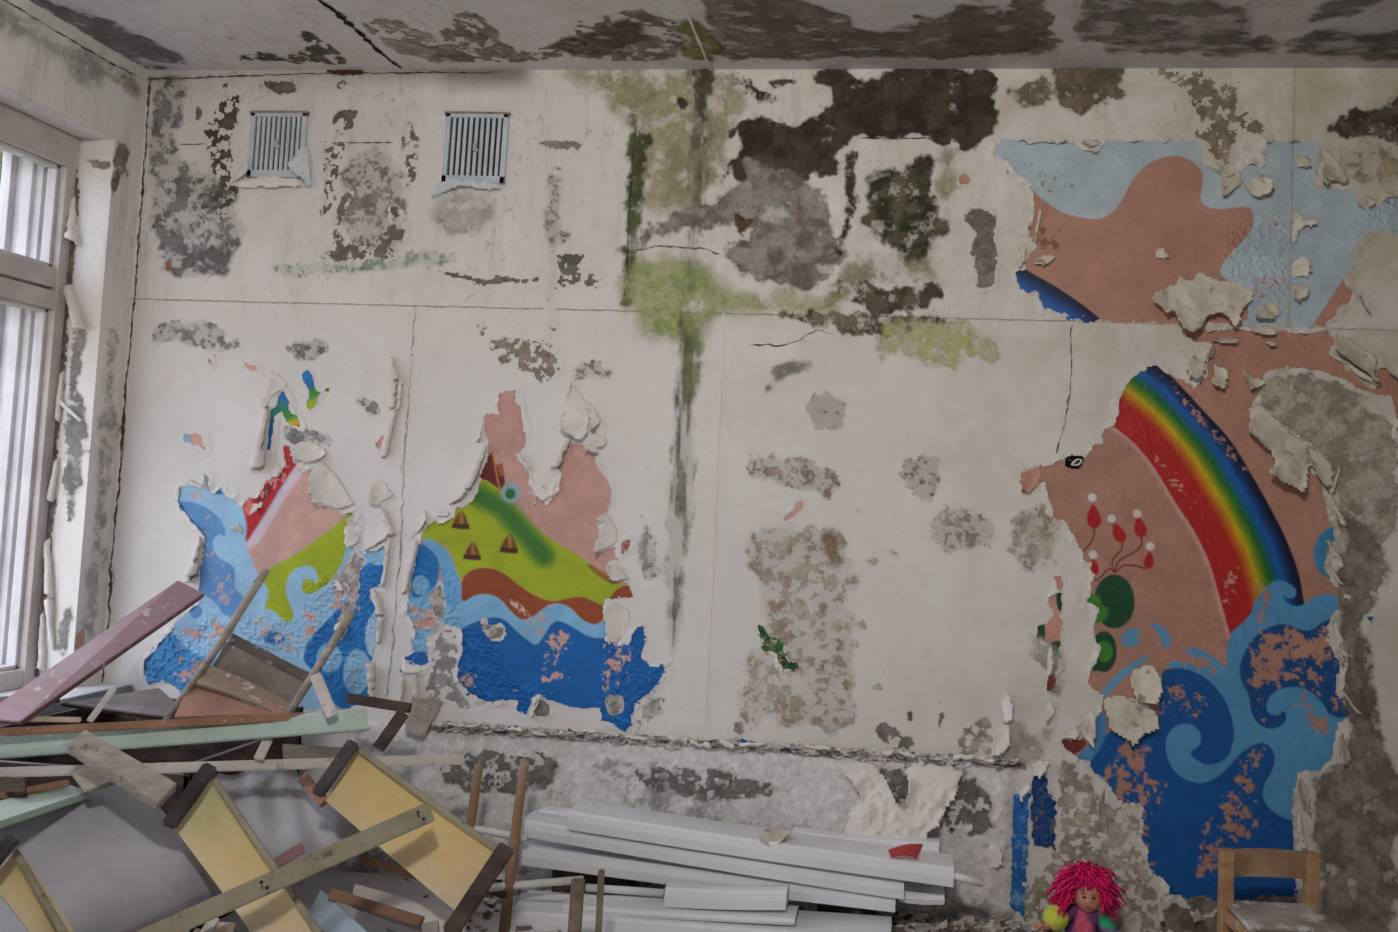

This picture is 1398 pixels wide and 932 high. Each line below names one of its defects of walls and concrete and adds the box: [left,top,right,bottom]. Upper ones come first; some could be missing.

crack [4,0,490,630]
peeling [138,356,395,711]
spalling [195,31,411,263]
peeling [370,356,403,458]
crack [386,306,416,698]
leakage [638,526,656,577]
leakage [671,574,682,634]
leakage [670,318,699,550]
peeling [397,68,1398,932]
leakage [640,0,1398,339]